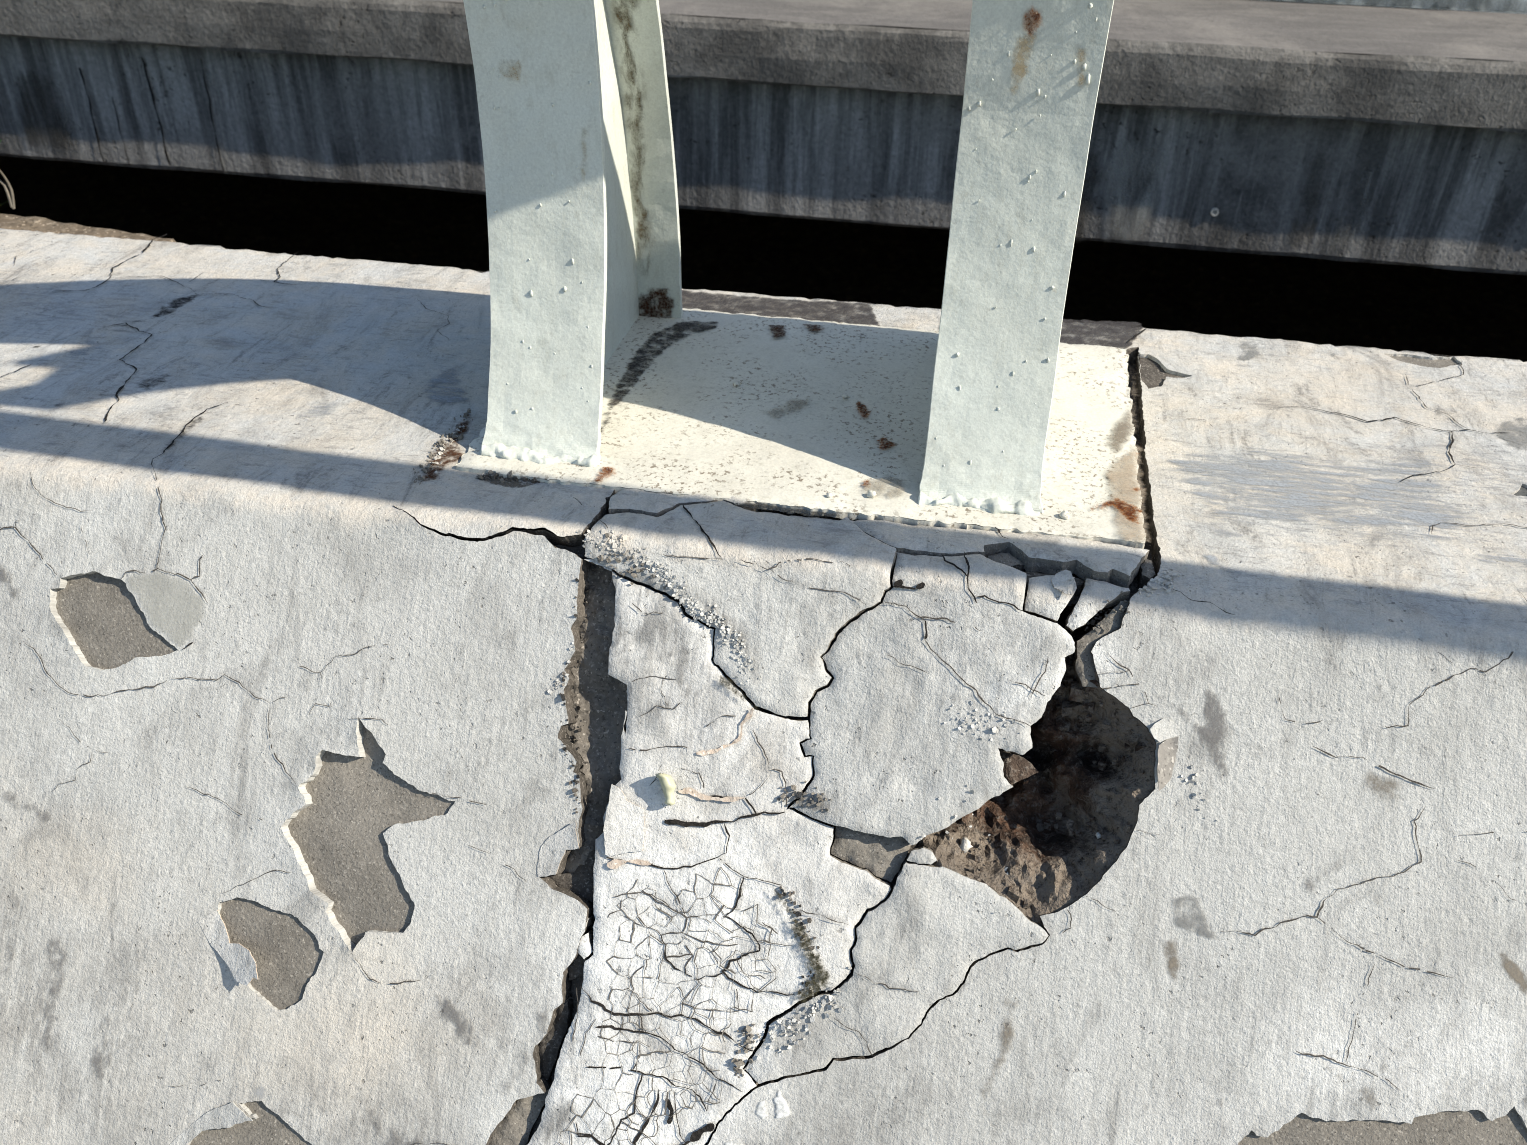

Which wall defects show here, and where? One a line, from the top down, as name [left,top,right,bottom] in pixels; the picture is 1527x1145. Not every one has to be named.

rust [1013,9,1040,87]
crack [0,402,226,603]
rust [1098,412,1146,540]
crack [1280,362,1506,482]
peeling [49,571,178,670]
spalling [394,347,1192,1145]
crack [1385,652,1513,728]
peeling [218,897,324,1010]
peeling [281,717,455,952]
crack [527,497,1048,1145]
crack [1220,695,1452,1091]
peeling [1238,1107,1527,1145]